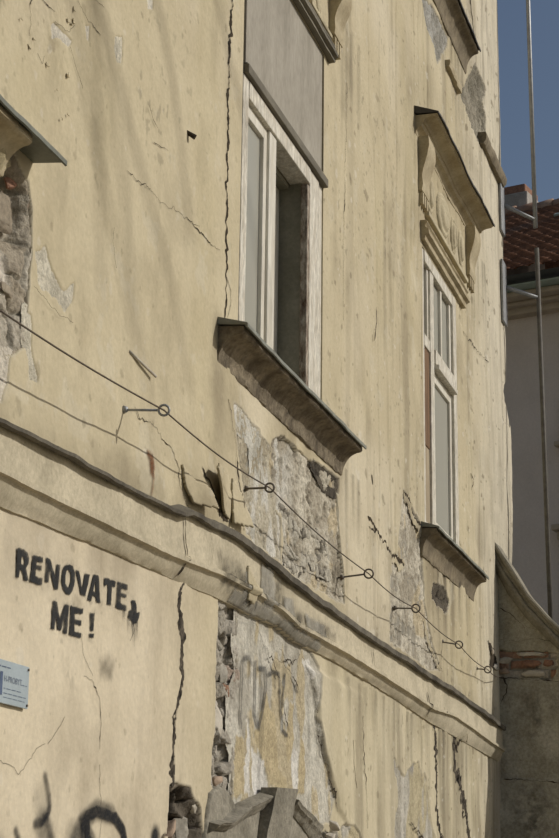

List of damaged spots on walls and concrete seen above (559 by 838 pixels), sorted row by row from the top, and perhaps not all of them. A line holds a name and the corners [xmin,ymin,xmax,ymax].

crack [29,0,103,84]
spalling [422,0,447,62]
spalling [461,63,485,149]
crack [129,0,234,317]
spalling [0,148,74,401]
crack [368,515,405,572]
crack [137,411,191,787]
peeling [211,405,344,838]
spalling [488,640,558,680]
crack [411,692,471,838]
spalling [161,784,202,838]